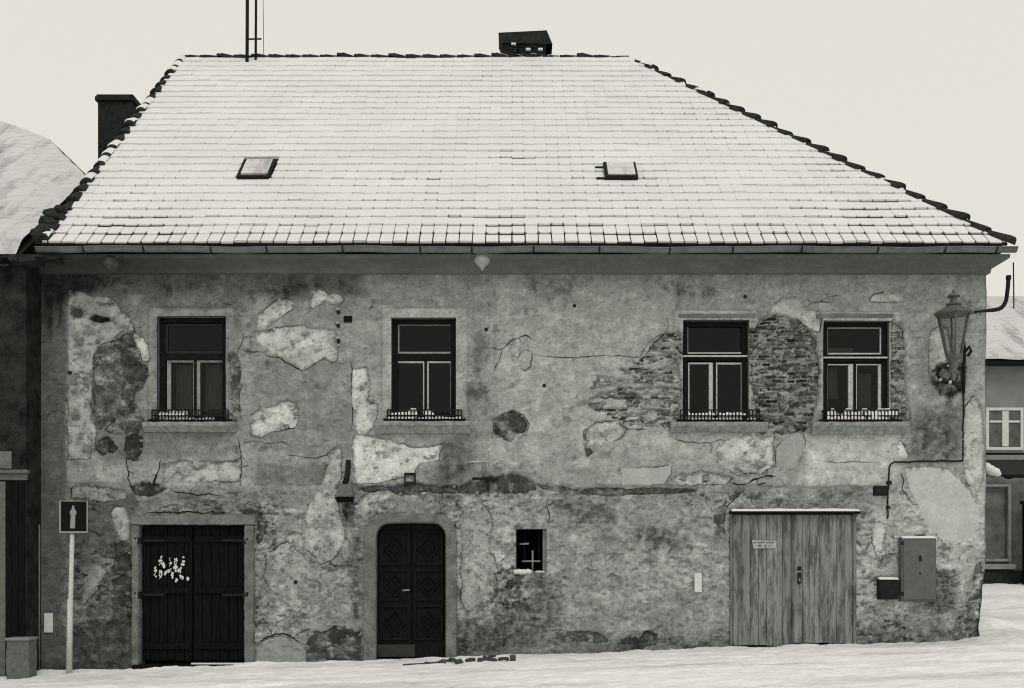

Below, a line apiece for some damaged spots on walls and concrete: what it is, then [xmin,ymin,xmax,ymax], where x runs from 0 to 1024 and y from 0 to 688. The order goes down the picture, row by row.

flaking render [310,290,344,308]
flaking render [65,290,150,461]
flaking render [228,353,299,438]
crack [487,321,670,371]
flaking render [890,321,911,422]
crack [126,439,337,514]
flaking render [239,296,822,618]
crack [703,432,806,485]
flaking render [897,397,984,545]